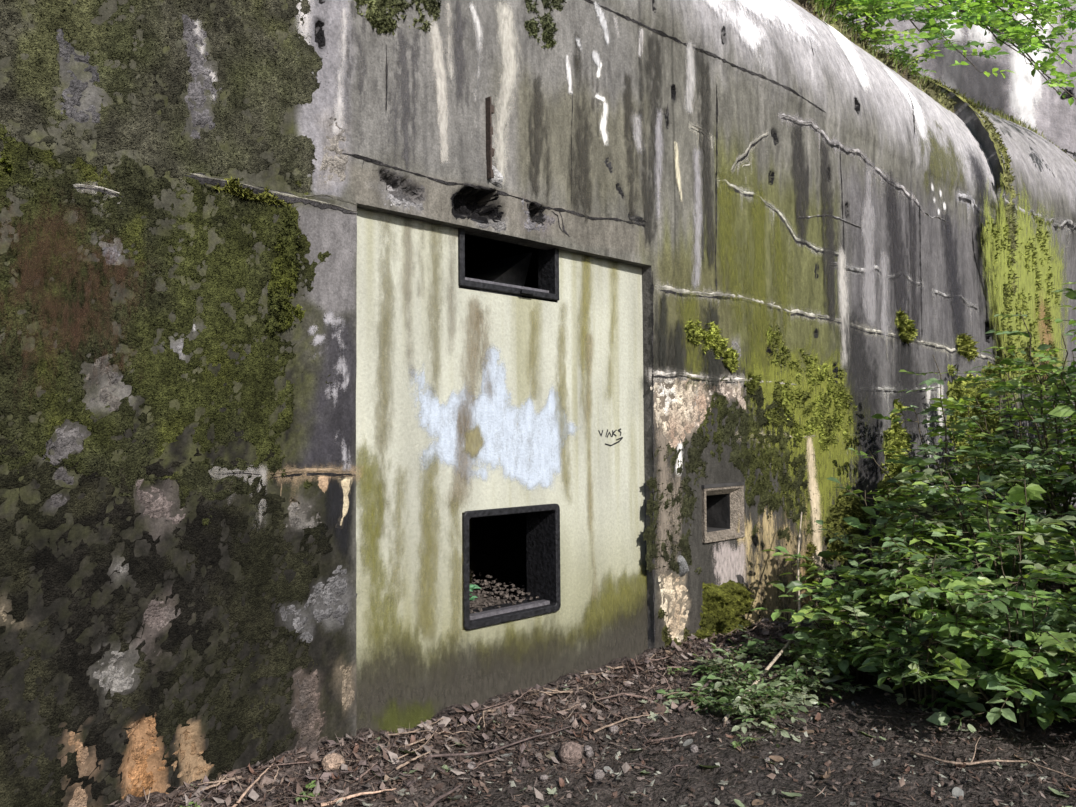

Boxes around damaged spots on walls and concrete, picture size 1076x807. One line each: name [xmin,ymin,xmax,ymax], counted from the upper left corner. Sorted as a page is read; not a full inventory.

water stain [707,0,868,87]
water stain [566,38,608,219]
water stain [624,30,682,242]
spalling [450,185,506,235]
water stain [655,43,791,391]
crack [585,0,1076,638]
water stain [792,122,943,484]
peeling [650,378,746,449]
peeling [279,565,357,643]
water stain [356,599,648,732]
peeling [658,569,689,642]
spalling [68,786,88,807]